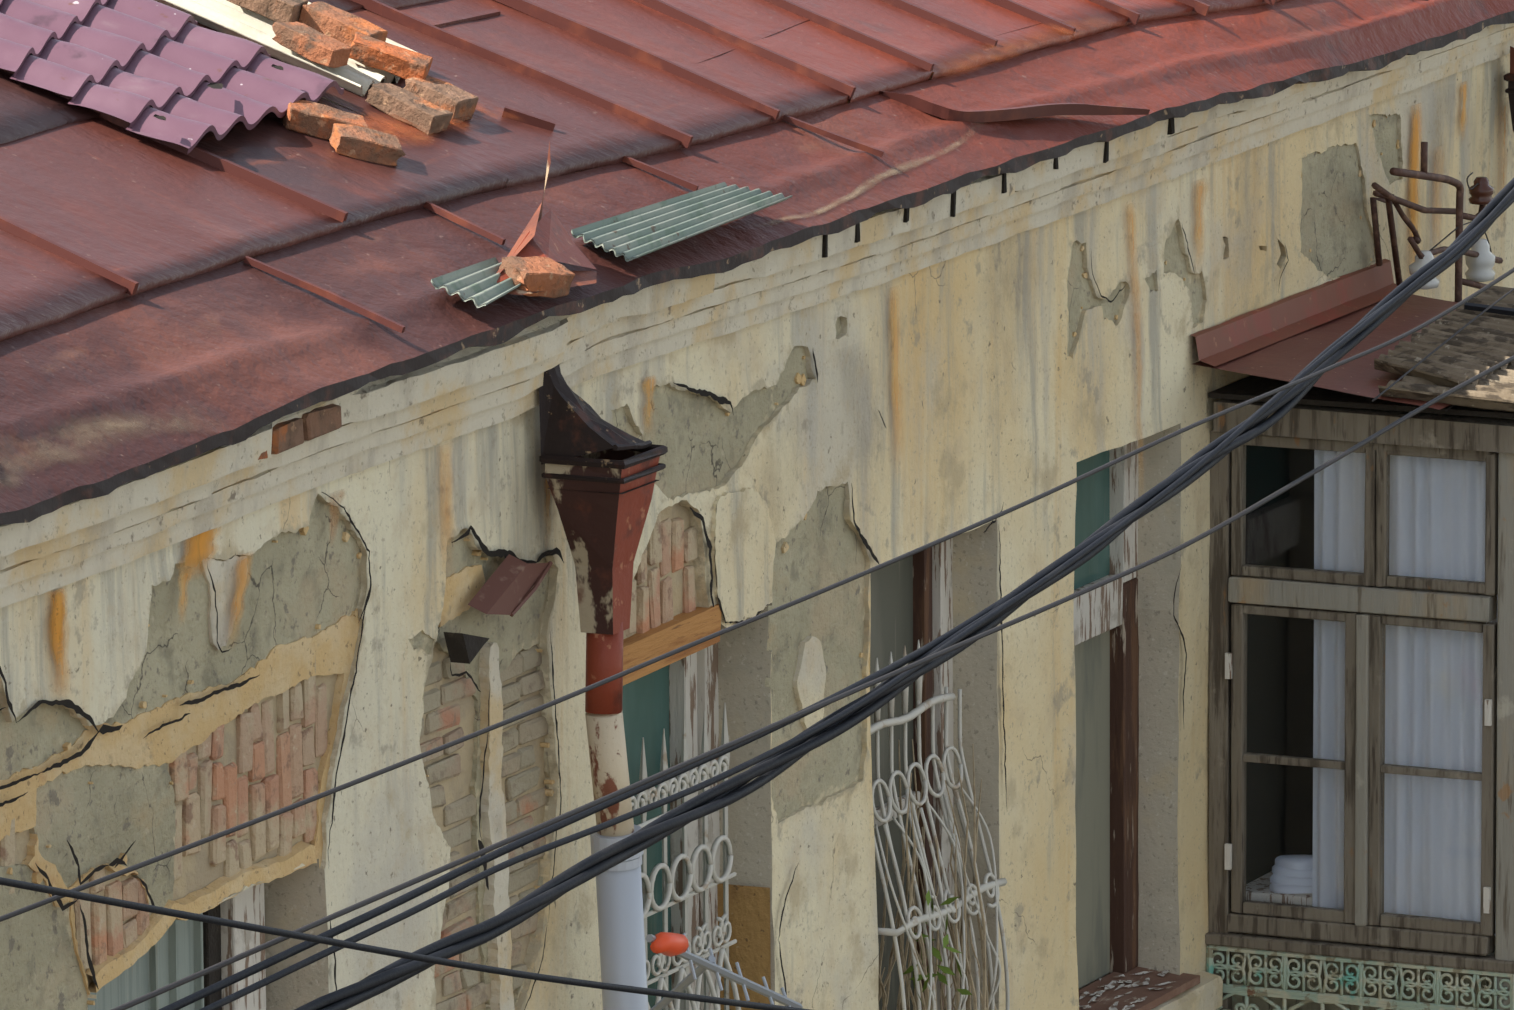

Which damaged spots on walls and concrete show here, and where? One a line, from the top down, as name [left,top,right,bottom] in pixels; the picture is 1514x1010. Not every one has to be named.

rust [1410,111,1421,237]
crack [1091,259,1125,303]
peeling [611,346,809,637]
rust [52,592,65,674]
rust [181,529,216,604]
peeling [105,498,362,725]
peeling [765,484,866,749]
flaking render [169,655,328,881]
spalling [408,530,555,939]
peeling [771,722,862,821]
flaking render [74,867,149,970]
spalling [434,913,539,1010]